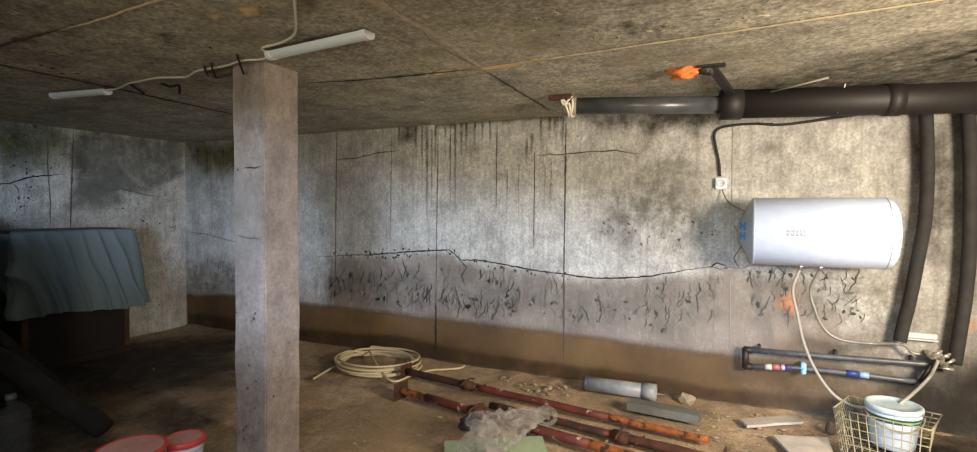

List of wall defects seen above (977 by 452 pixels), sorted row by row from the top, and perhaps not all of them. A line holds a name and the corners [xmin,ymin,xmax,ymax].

damp [398,122,491,173]
crack [0,141,159,226]
crack [319,222,752,284]